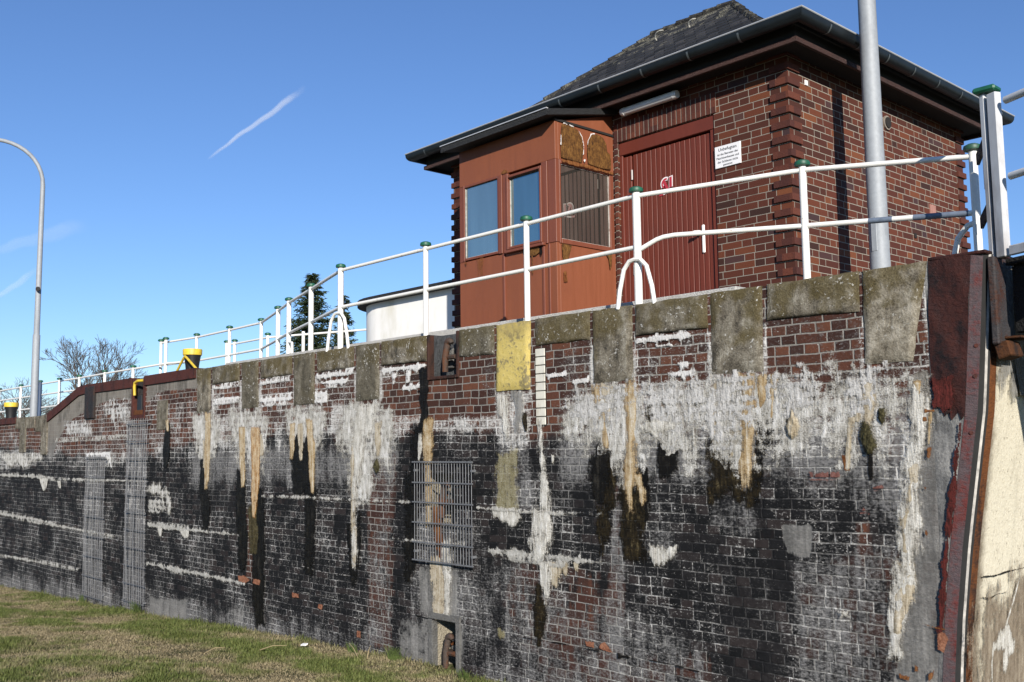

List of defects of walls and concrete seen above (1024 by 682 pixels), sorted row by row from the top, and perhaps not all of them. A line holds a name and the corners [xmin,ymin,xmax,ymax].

damp [635,330,691,347]
damp [1,452,42,468]
damp [147,482,171,514]
damp [162,420,170,469]
damp [199,459,209,534]
damp [236,469,265,628]
damp [289,435,317,577]
damp [347,402,382,587]
damp [488,360,894,647]
damp [887,380,931,661]
corrosion [923,409,935,458]